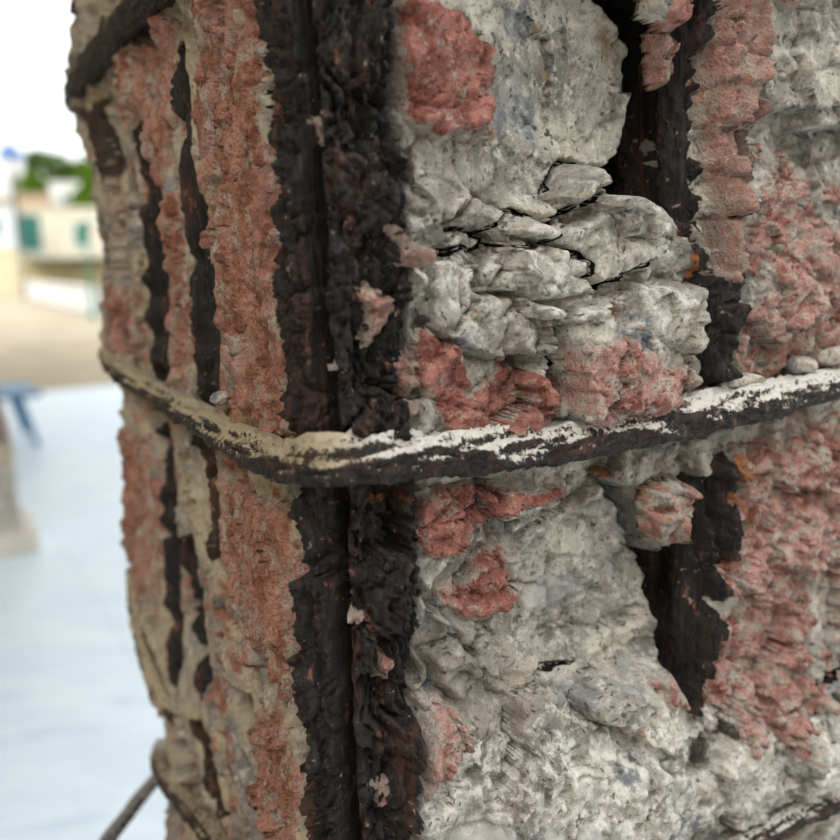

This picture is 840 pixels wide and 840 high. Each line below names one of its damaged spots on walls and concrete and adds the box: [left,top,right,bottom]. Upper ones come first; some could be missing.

rust [591,0,610,17]
rust [683,0,716,123]
spalling [98,0,840,441]
crack [434,191,653,290]
crack [537,161,581,194]
rust [599,162,615,195]
rust [635,48,658,205]
rust [672,157,716,290]
rust [413,313,430,332]
spalling [116,405,840,840]
rust [648,475,734,717]
rust [689,715,740,763]